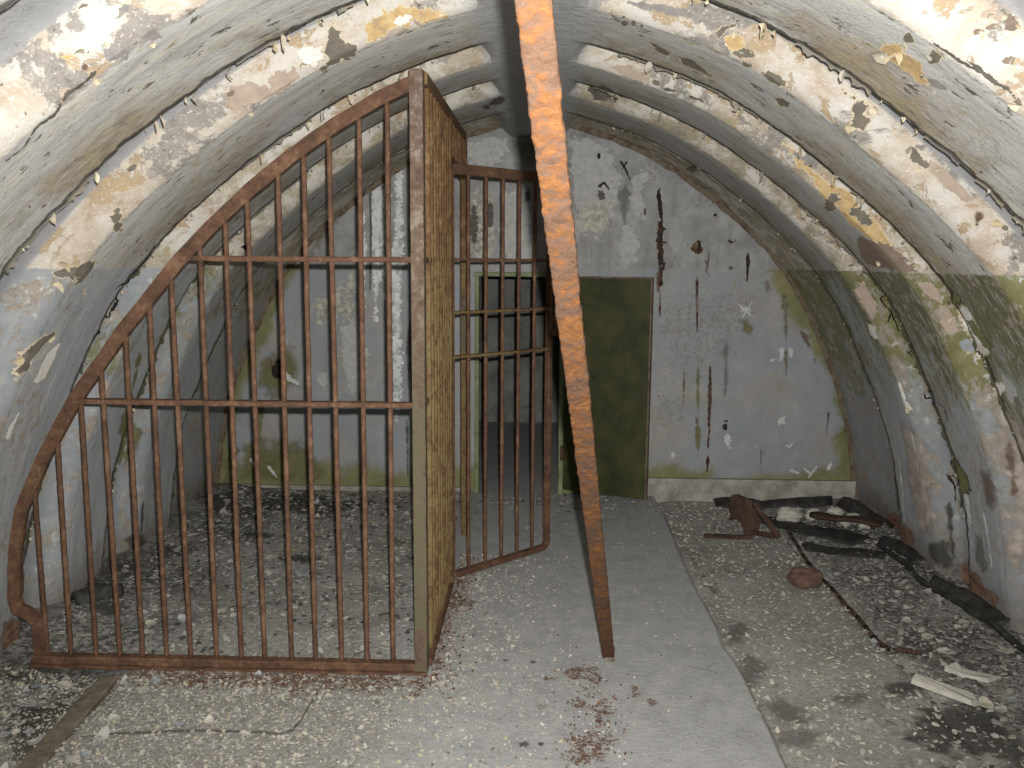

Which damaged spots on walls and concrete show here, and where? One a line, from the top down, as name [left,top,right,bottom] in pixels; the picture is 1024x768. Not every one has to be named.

peeling [225,0,450,117]
peeling [714,22,790,108]
peeling [796,42,883,134]
peeling [872,31,948,95]
peeling [959,5,1022,40]
peeling [241,106,331,170]
peeling [905,129,973,202]
peeling [4,171,100,274]
peeling [109,207,124,239]
peeling [49,258,99,296]
peeling [10,331,61,384]
peeling [132,309,177,413]